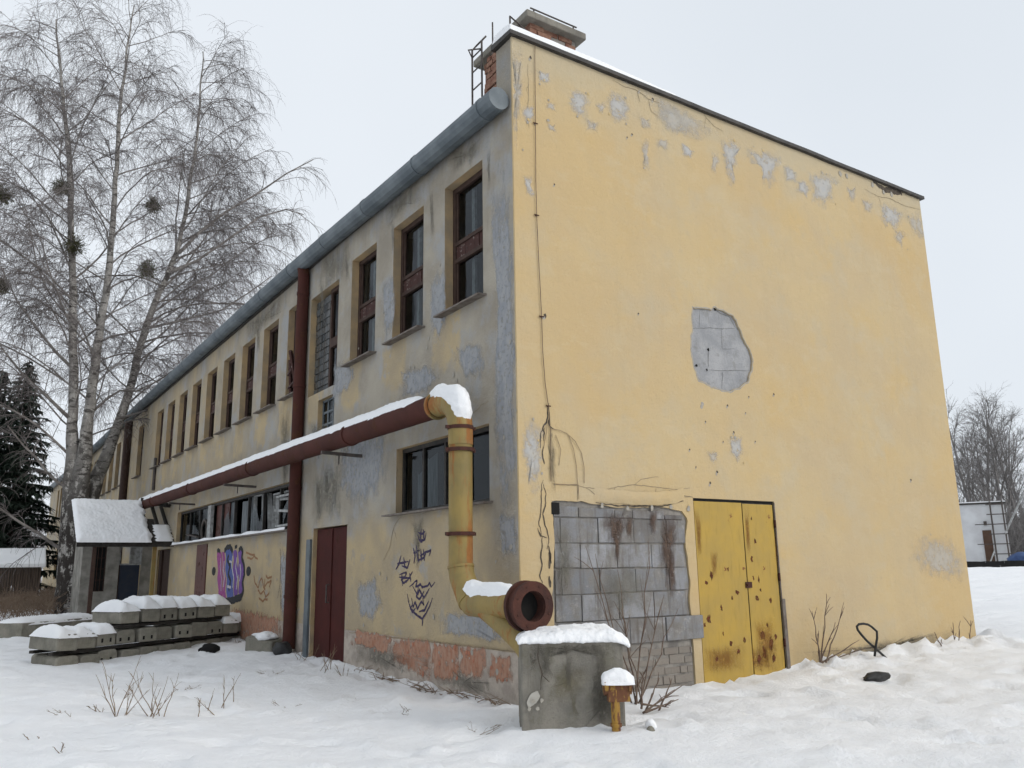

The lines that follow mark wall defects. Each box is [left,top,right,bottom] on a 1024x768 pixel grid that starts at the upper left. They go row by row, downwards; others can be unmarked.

peeling [712,139,923,250]
spalling [690,306,754,408]
spalling [551,502,560,514]
crack [538,408,691,587]
peeling [351,572,512,683]
rust [716,624,777,665]